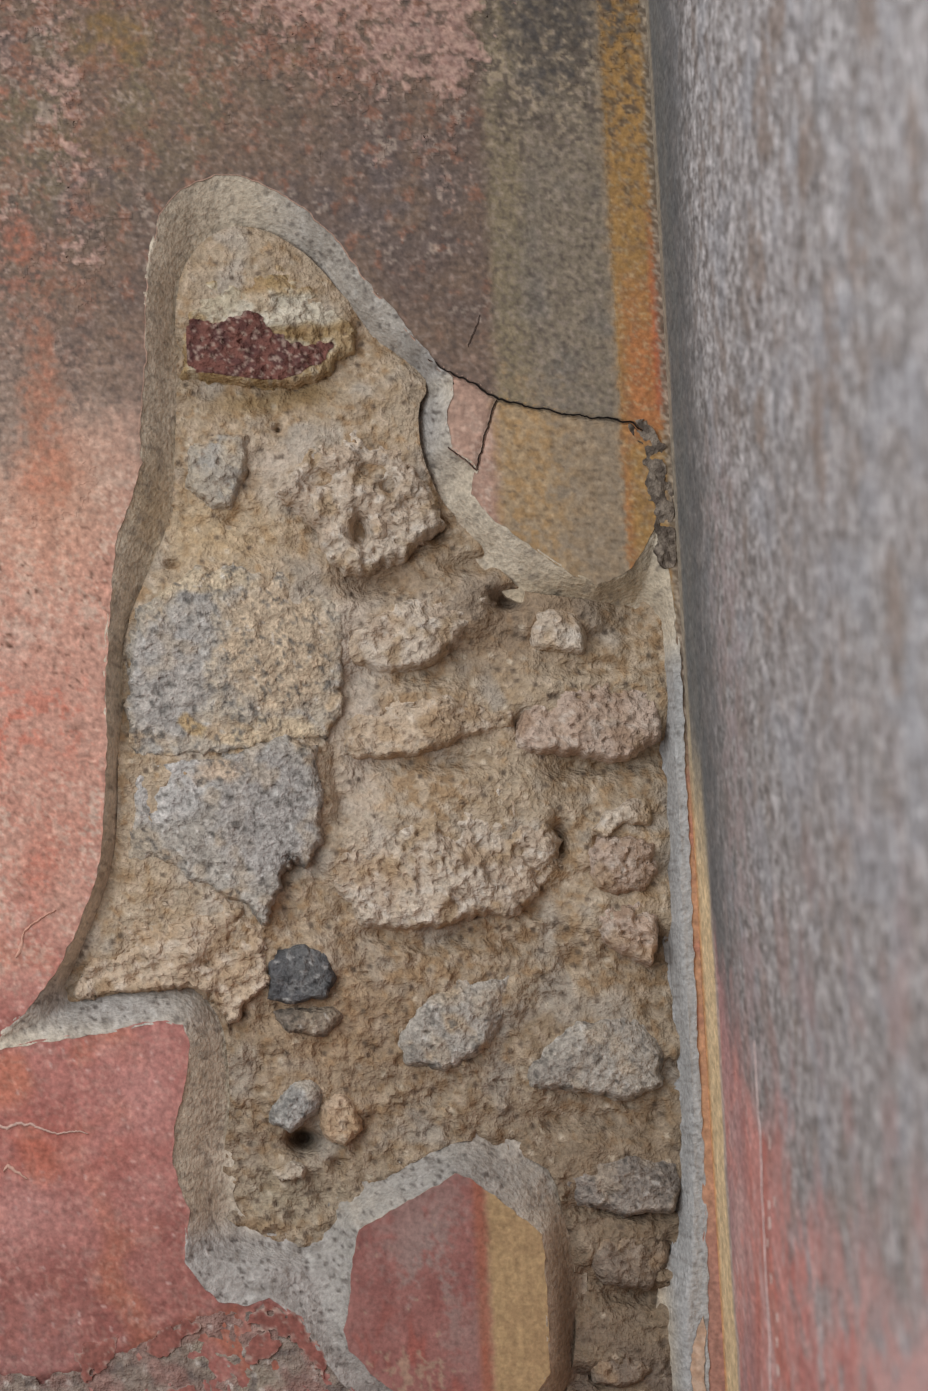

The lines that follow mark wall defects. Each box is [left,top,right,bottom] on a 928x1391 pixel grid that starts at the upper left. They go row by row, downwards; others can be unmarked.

crack [428,316,643,471]
spalling [0,175,710,1391]
crack [0,1121,88,1135]